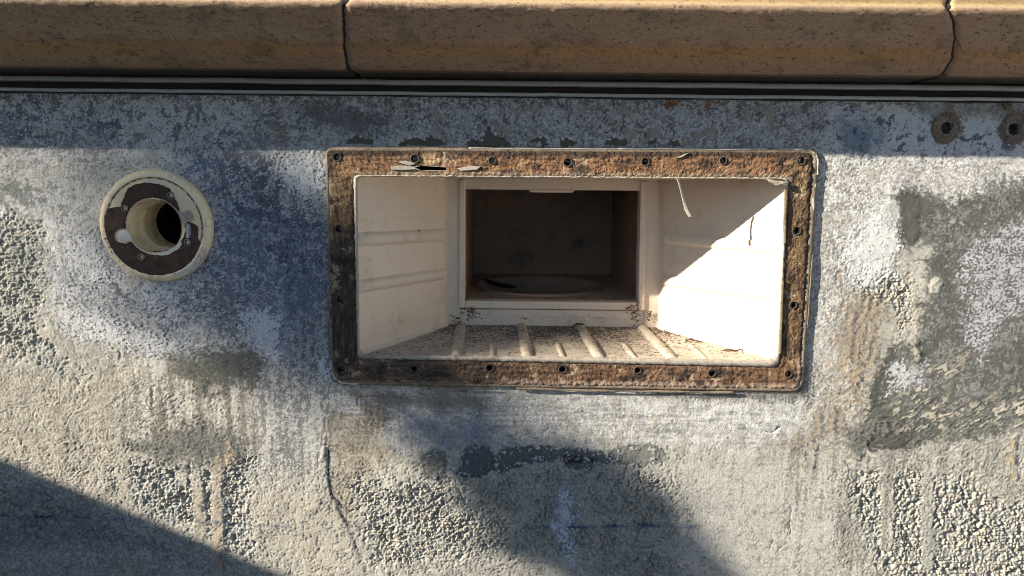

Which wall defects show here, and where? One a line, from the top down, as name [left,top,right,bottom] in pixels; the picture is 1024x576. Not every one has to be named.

crack [940,0,963,75]
peeling [346,135,373,145]
peeling [399,135,445,147]
peeling [467,126,510,147]
peeling [531,136,576,147]
peeling [605,137,627,146]
damp [618,176,1024,472]
damp [129,419,249,472]
crack [317,421,349,525]